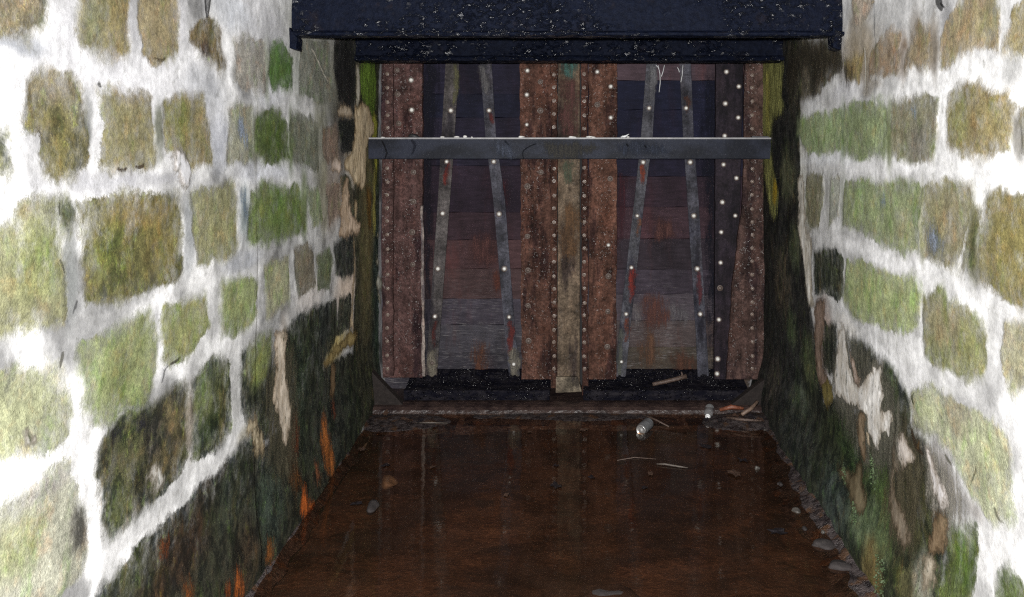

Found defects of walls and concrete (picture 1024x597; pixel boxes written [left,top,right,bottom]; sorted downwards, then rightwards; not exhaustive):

corrosion [289,419,313,515]
corrosion [315,404,335,481]